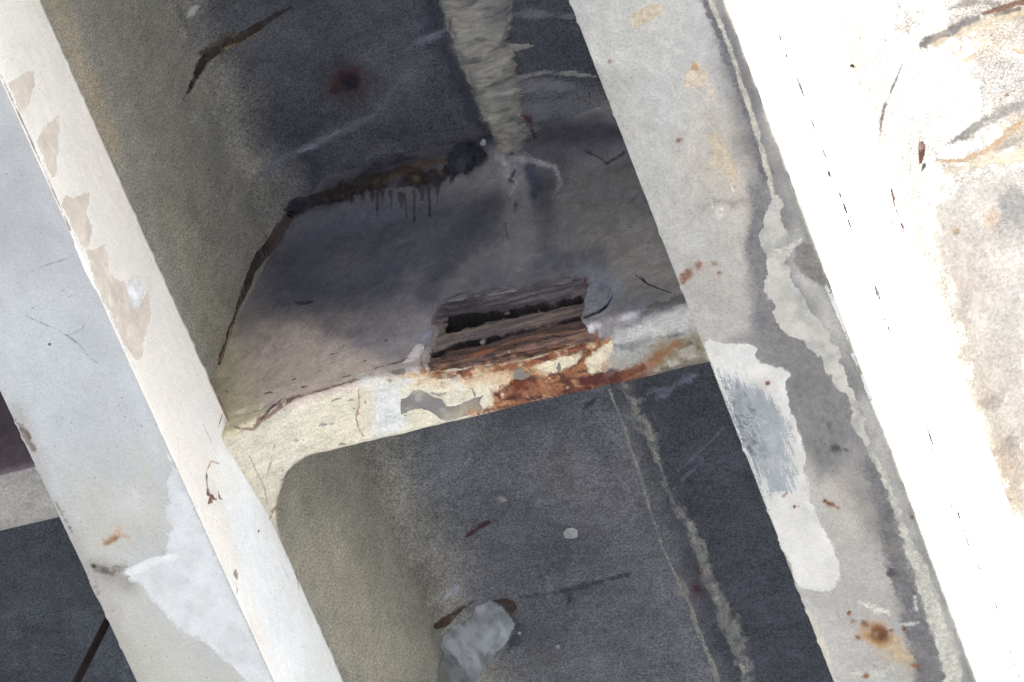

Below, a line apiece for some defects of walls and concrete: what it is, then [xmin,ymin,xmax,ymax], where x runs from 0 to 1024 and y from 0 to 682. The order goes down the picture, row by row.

water stain [218,0,596,365]
spalling [48,180,136,369]
spalling [391,271,613,380]
peeling [400,389,483,421]
corrosion [389,334,700,417]
spalling [805,609,837,682]
corrosion [847,611,921,669]